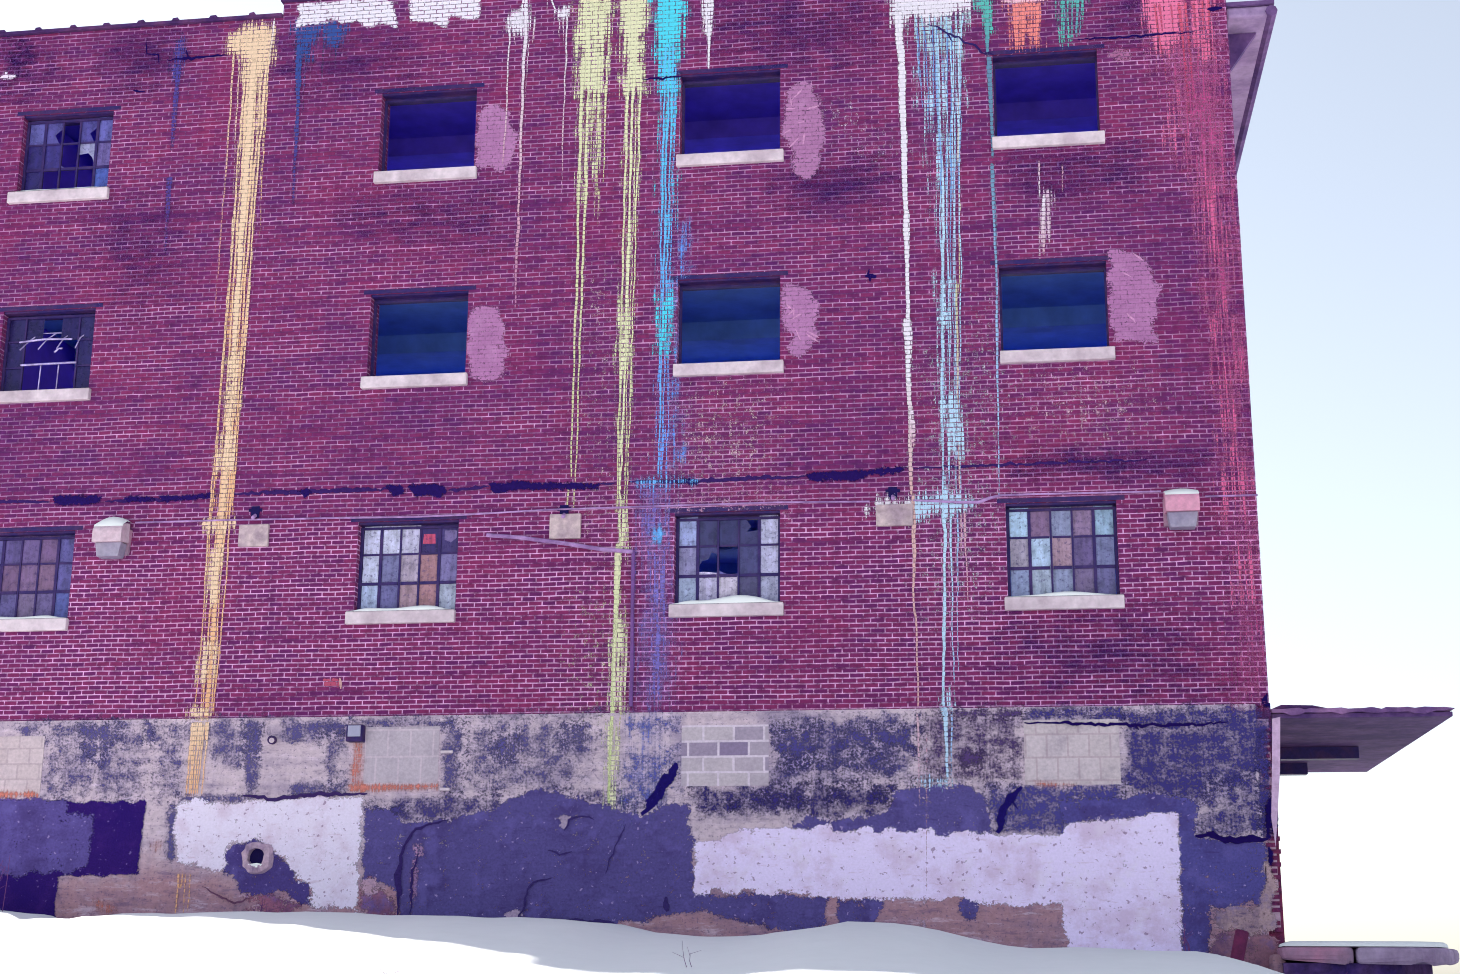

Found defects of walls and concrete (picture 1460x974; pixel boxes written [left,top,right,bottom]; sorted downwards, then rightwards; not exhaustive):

damp [16,0,1272,861]
crack [1024,720,1228,730]
crack [394,820,447,915]
crack [518,763,678,924]
crack [996,786,1023,834]
crack [1195,831,1268,844]